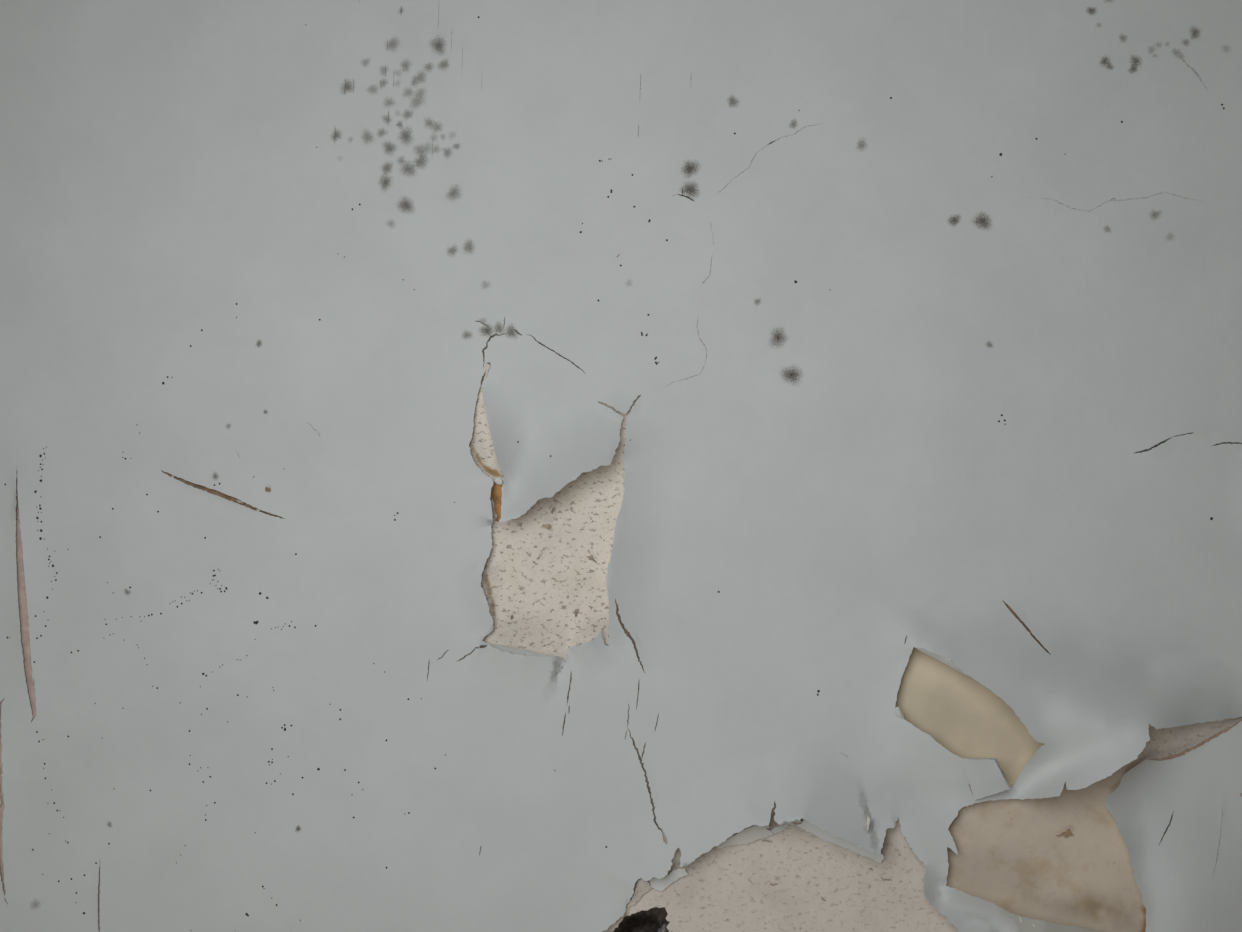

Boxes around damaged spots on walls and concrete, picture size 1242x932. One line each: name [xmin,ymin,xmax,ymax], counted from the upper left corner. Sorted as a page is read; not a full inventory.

crack [476,318,585,385]
peeling [469,343,641,663]
crack [1135,432,1242,453]
crack [615,598,668,845]
peeling [602,647,1242,932]